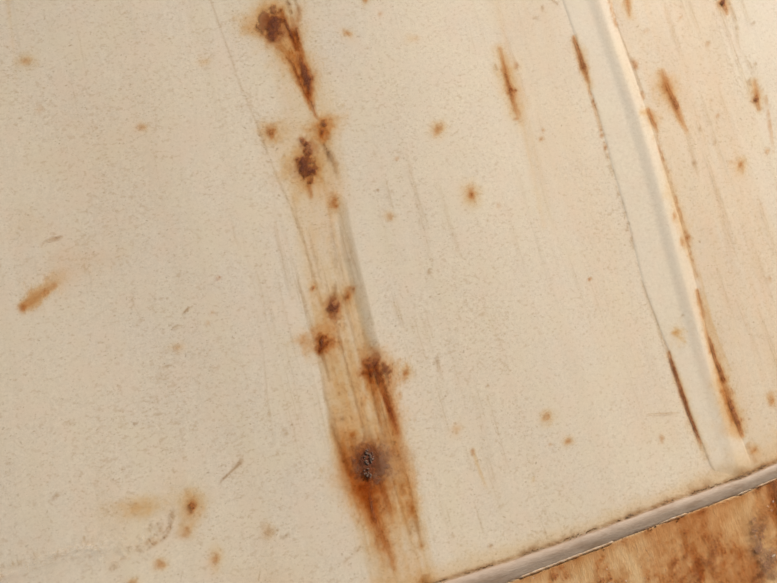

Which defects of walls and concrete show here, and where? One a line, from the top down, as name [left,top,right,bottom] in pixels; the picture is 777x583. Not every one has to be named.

corrosion [256,5,298,41]
corrosion [298,139,318,183]
corrosion [369,362,392,389]
corrosion [354,446,390,480]